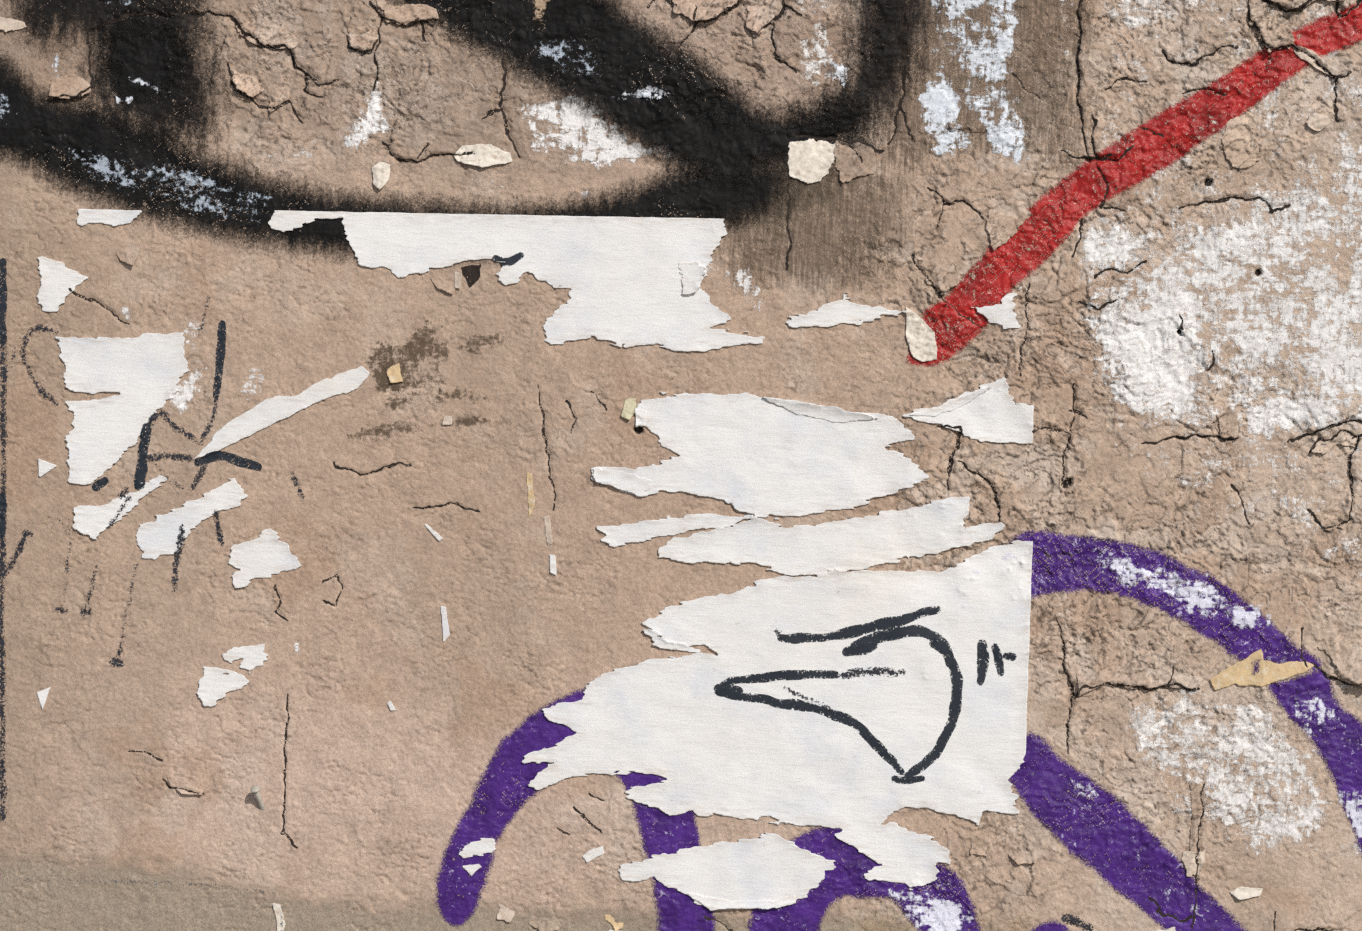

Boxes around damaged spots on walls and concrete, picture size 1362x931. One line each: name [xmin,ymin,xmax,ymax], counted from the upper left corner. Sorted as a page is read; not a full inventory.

crack [42,1,434,124]
peeling [540,40,595,74]
crack [647,0,802,73]
peeling [672,0,778,34]
peeling [799,0,847,87]
crack [1061,0,1362,310]
peeling [986,199,1032,251]
peeling [905,307,937,362]
peeling [621,398,647,434]
crack [937,424,1001,522]
crack [1287,419,1362,529]
crack [1055,619,1200,754]